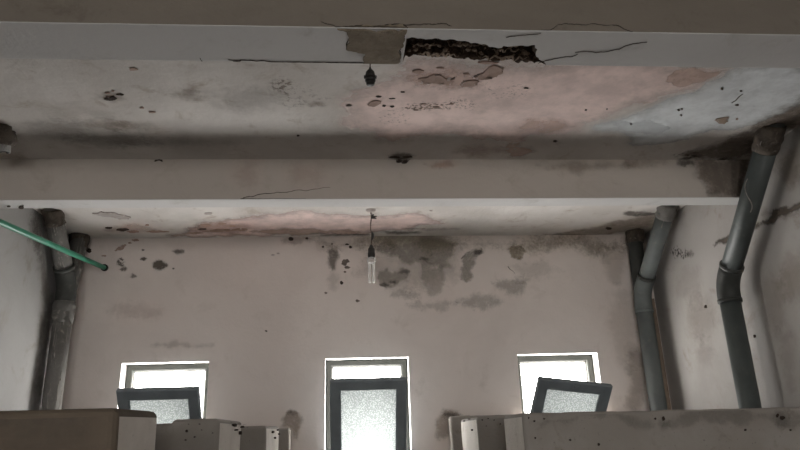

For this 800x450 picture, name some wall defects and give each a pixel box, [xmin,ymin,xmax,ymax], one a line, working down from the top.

crack [228,57,363,65]
spalling [337,24,546,88]
crack [506,23,647,63]
damp [678,105,800,195]
crack [240,187,330,199]
peeling [92,211,169,251]
damp [140,249,174,270]
damp [186,211,453,287]
damp [461,250,482,282]
damp [510,246,524,259]